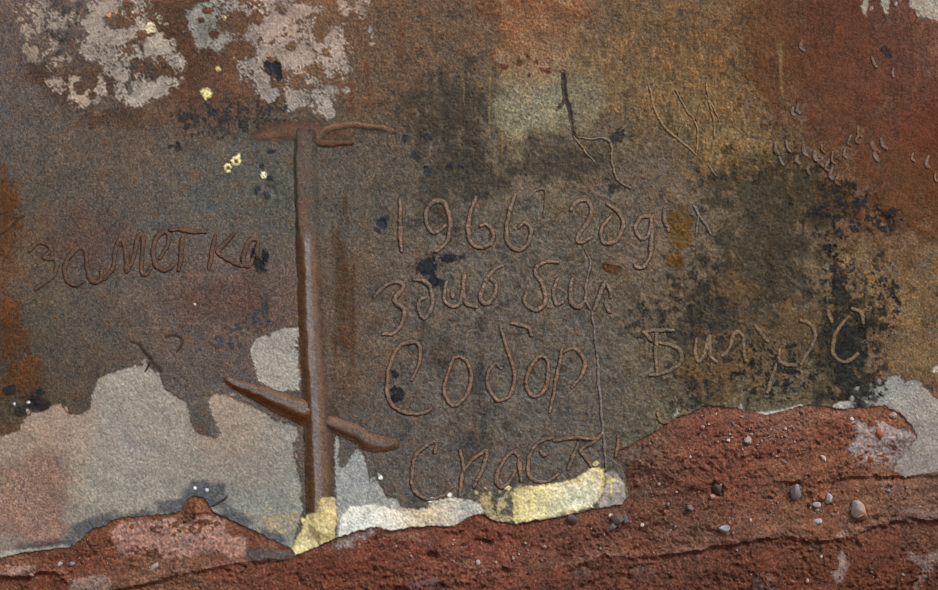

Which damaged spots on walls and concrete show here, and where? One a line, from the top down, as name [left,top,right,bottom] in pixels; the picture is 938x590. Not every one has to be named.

peeling [12,0,187,108]
peeling [186,0,375,122]
crack [555,72,632,189]
water stain [409,0,907,416]
corrosion [742,0,938,236]
peeling [250,327,301,392]
crack [584,249,607,471]
spalling [0,359,938,590]